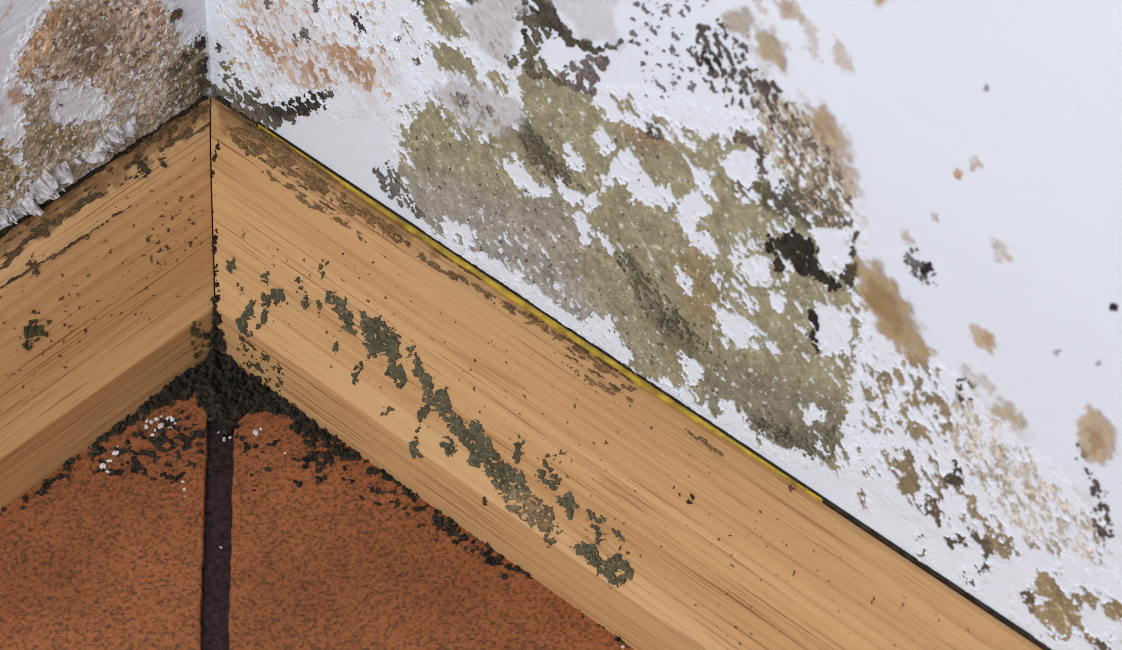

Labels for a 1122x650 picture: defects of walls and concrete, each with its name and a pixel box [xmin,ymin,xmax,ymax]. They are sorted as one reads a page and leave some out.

leakage [23,0,183,107]
leakage [290,27,311,47]
leakage [350,11,367,34]
leakage [0,31,641,588]
leakage [446,83,746,401]
leakage [629,0,937,364]
leakage [743,375,842,463]
leakage [944,366,1115,561]